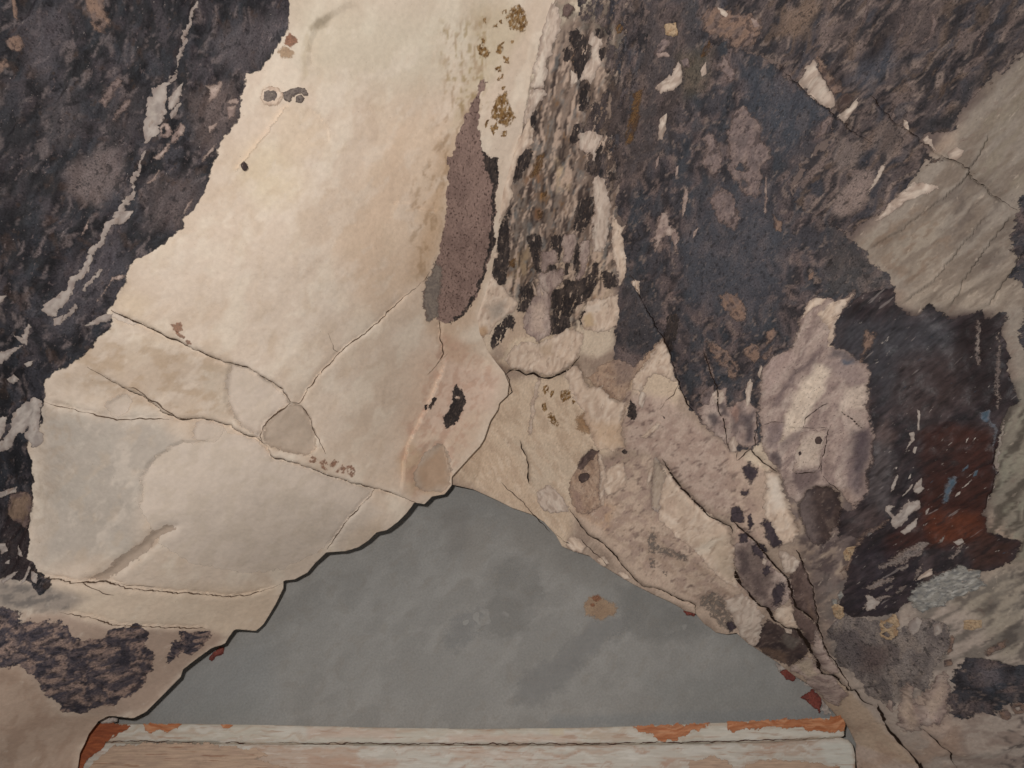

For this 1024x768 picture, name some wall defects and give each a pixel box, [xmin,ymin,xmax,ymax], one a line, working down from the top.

water stain [492,206,513,286]
crack [46,275,428,549]
crack [632,277,862,492]
spalling [91,525,176,581]
crack [30,570,280,597]
spalling [646,457,798,646]
water stain [730,461,819,666]
crack [662,459,923,768]
water stain [797,486,842,546]
water stain [908,565,987,613]
peeling [634,722,709,742]
spalling [727,630,849,733]